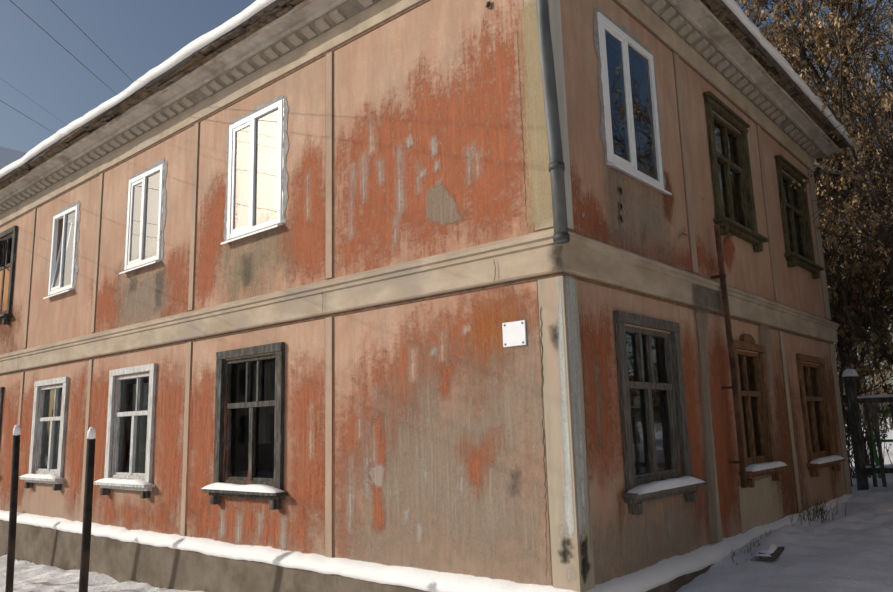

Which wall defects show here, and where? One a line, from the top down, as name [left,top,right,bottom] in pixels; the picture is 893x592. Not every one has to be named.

peeling [282,1,535,285]
peeling [66,285,540,555]